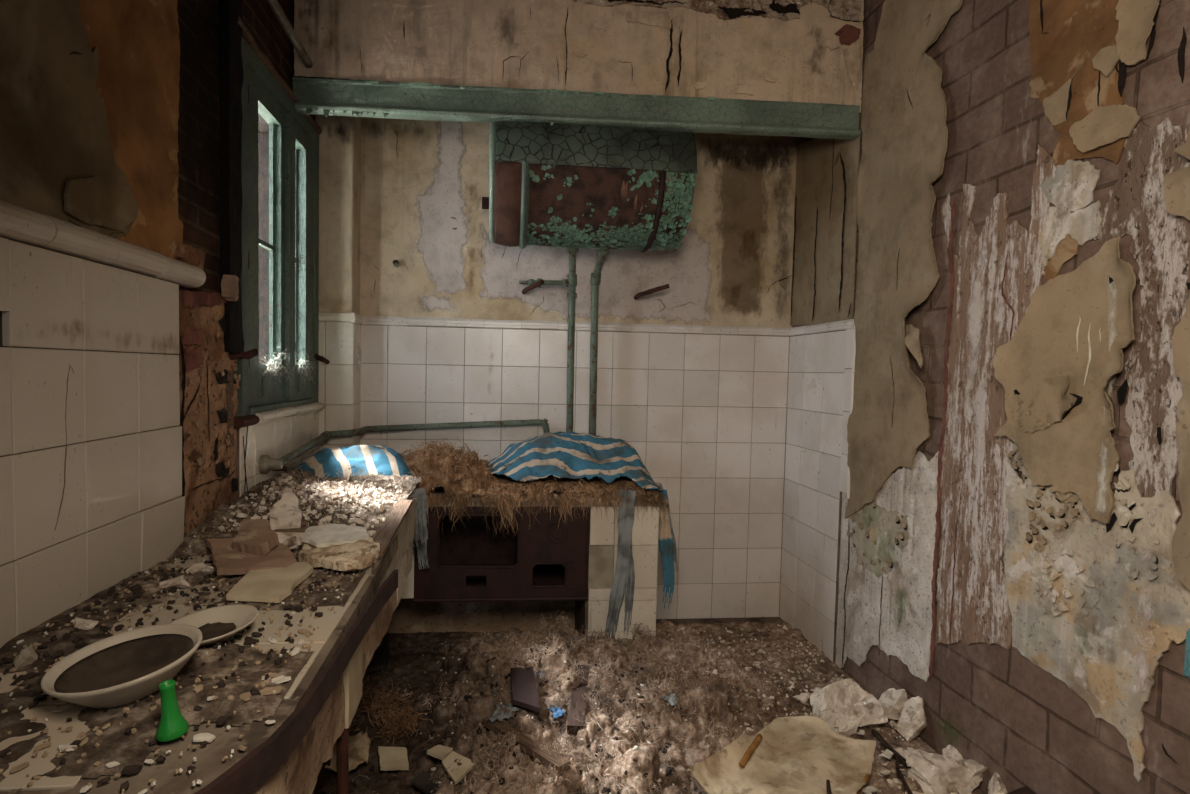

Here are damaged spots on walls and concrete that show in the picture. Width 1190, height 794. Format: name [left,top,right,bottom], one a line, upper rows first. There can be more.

crack [55,365,74,530]
peeling [0,0,205,271]
spalling [178,290,241,538]
peeling [416,121,468,310]
peeling [480,169,711,323]
spalling [574,0,862,45]
peeling [845,0,963,579]
peeling [993,0,1166,623]